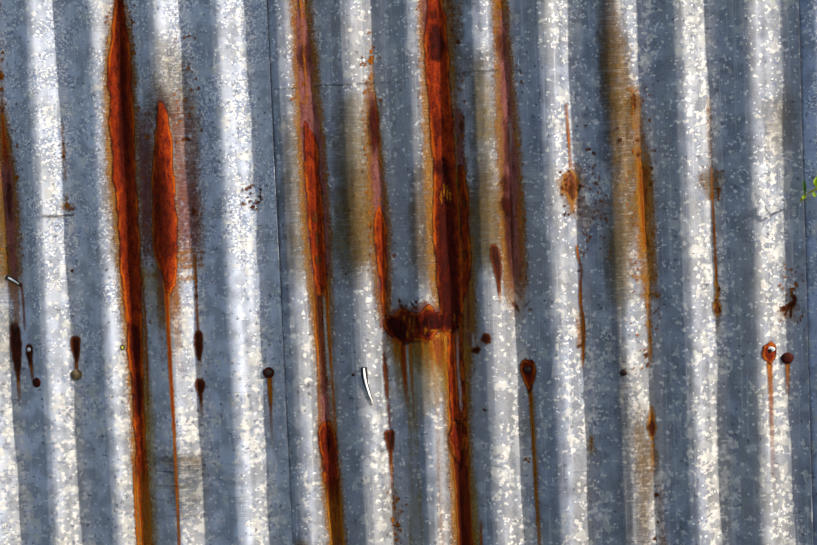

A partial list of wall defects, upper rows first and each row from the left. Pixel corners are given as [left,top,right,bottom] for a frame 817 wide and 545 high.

corrosion [0,71,33,393]
corrosion [71,336,81,369]
corrosion [104,0,205,545]
corrosion [284,0,347,545]
corrosion [360,0,491,545]
corrosion [490,0,528,312]
corrosion [520,358,540,545]
corrosion [761,341,777,412]
corrosion [779,264,804,330]